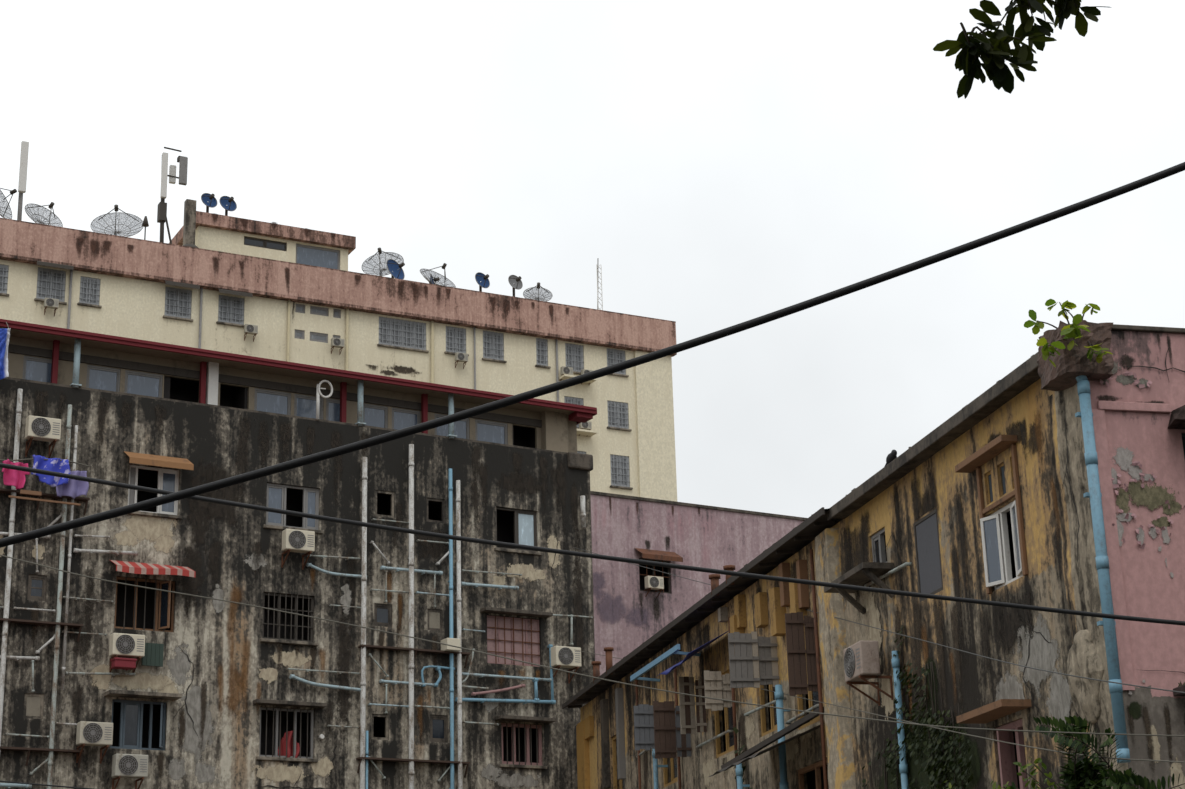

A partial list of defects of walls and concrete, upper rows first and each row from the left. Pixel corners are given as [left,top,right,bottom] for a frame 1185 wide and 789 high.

leakage [76,238,111,258]
leakage [398,281,451,303]
crack [1125,340,1185,380]
leakage [988,420,1044,458]
leakage [179,415,291,615]
leakage [844,512,870,573]
leakage [894,470,938,557]
peeling [1111,447,1185,578]
leakage [70,567,95,664]
leakage [325,548,356,743]
leakage [895,493,968,712]
leakage [979,592,1032,682]